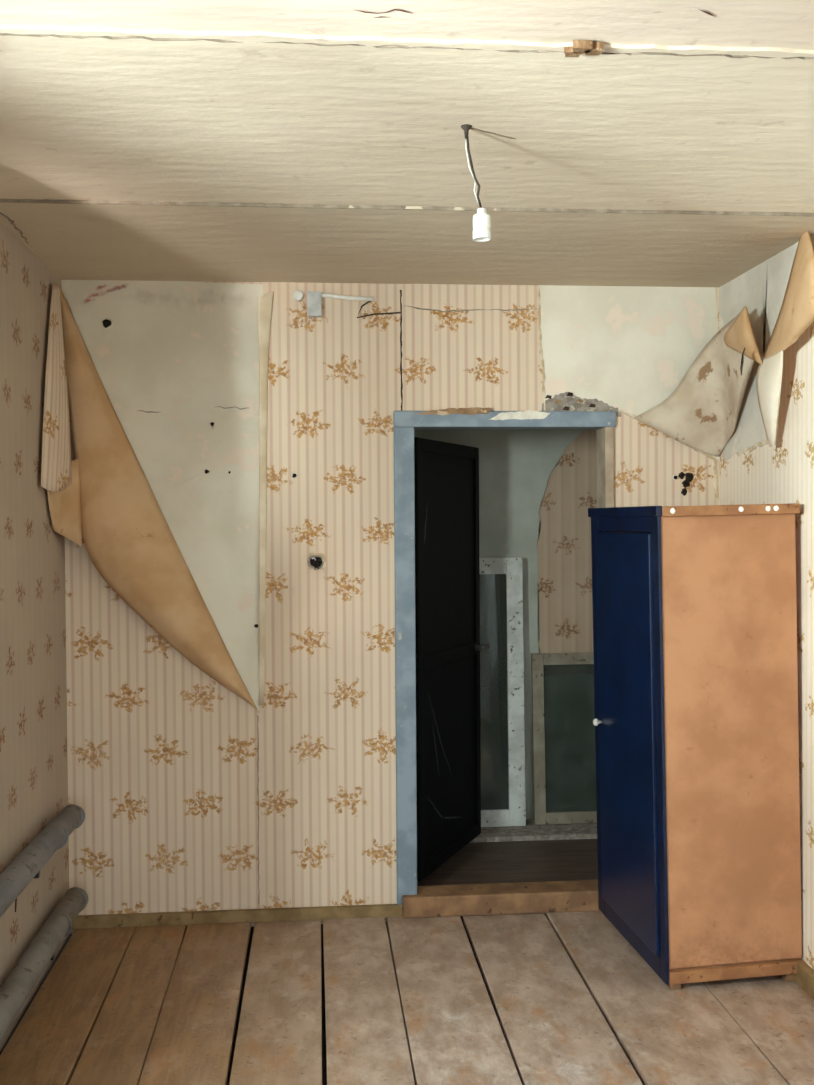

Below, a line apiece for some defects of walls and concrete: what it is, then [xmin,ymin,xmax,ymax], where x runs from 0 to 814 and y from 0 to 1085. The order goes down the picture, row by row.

crack [0,9,814,60]
flaking render [417,285,719,420]
flaking render [61,280,263,711]